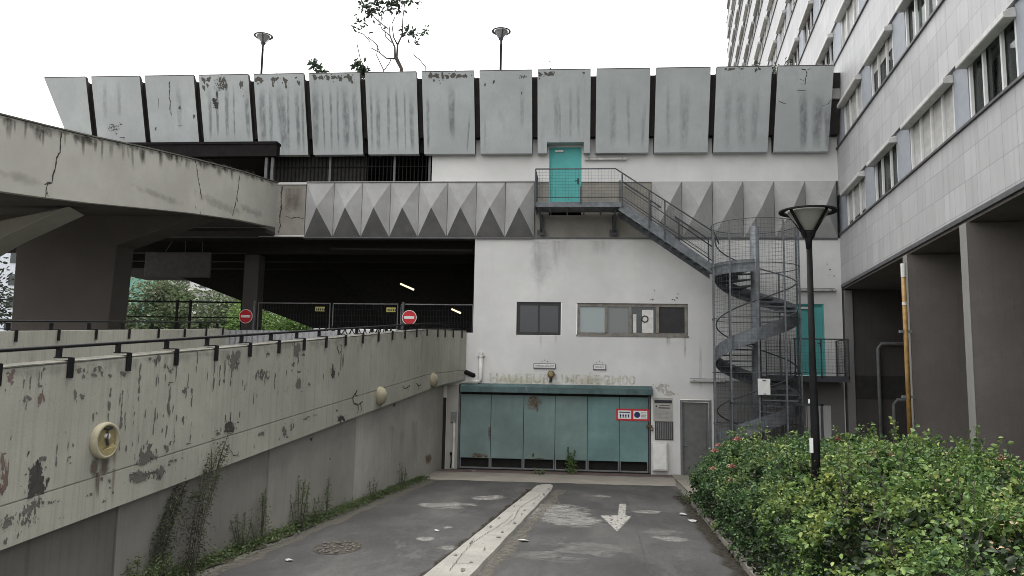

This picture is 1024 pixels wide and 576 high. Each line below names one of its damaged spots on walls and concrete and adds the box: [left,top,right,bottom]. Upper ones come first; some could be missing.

peeling [201,73,355,109]
peeling [428,70,472,84]
crack [45,133,62,197]
peeling [4,367,46,409]
spalling [77,342,311,484]
spalling [0,441,74,545]